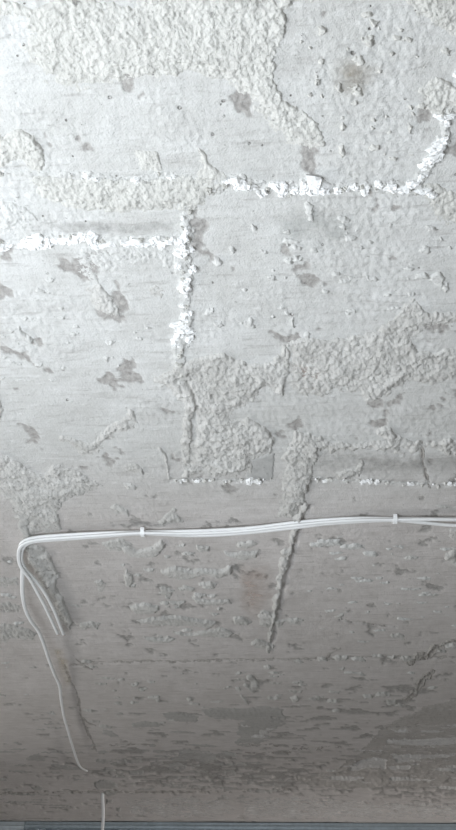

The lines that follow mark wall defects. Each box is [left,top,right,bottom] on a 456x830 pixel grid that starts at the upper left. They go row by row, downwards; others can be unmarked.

peeling [102,538,259,643]
peeling [202,706,286,746]
crack [64,637,456,752]